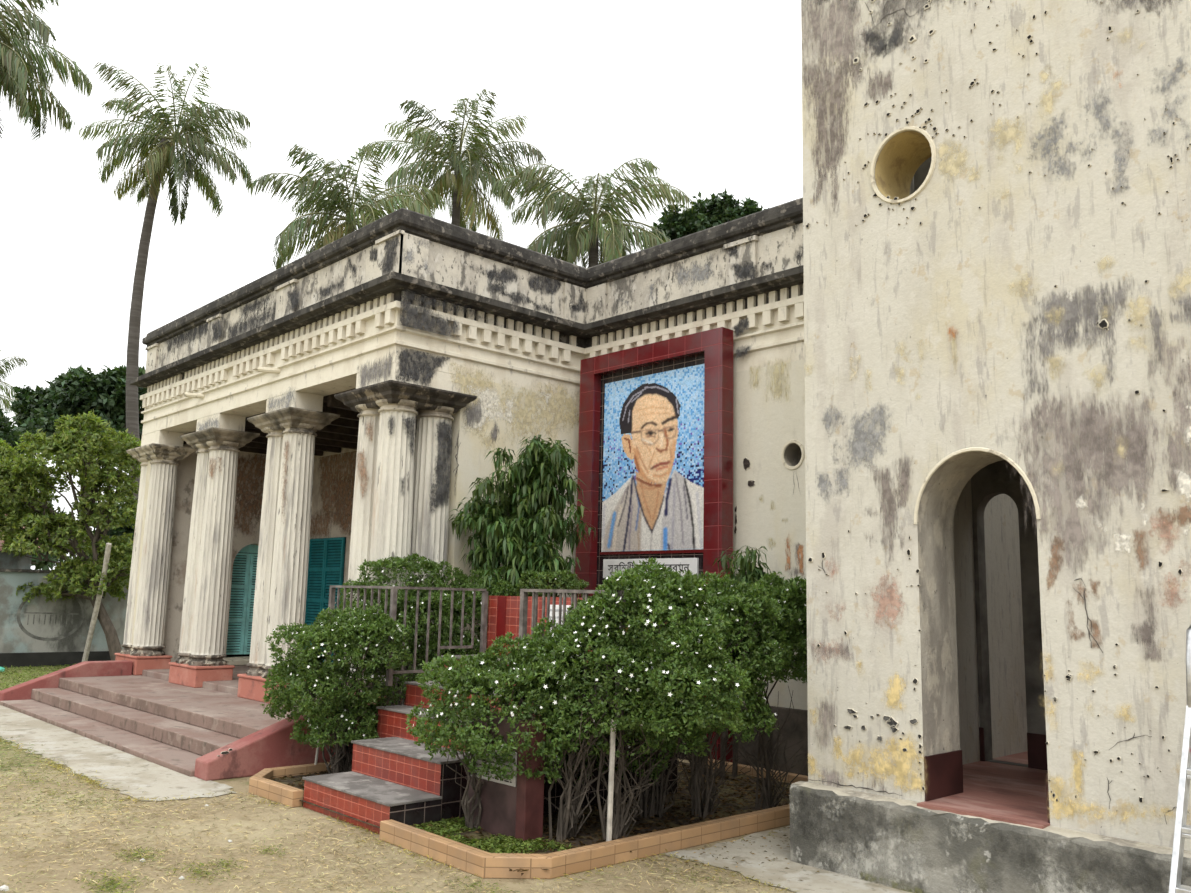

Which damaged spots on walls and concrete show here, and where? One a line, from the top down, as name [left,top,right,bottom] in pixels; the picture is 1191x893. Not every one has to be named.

flaking render [899,29,936,72]
leakage [801,0,919,202]
flaking render [864,89,973,138]
flaking render [855,193,922,226]
leakage [399,289,483,337]
leakage [470,266,586,313]
leakage [361,349,449,387]
leakage [1023,283,1156,566]
leakage [431,420,452,511]
peeling [1161,472,1191,498]
corrosion [785,539,803,573]
crack [1074,578,1103,653]